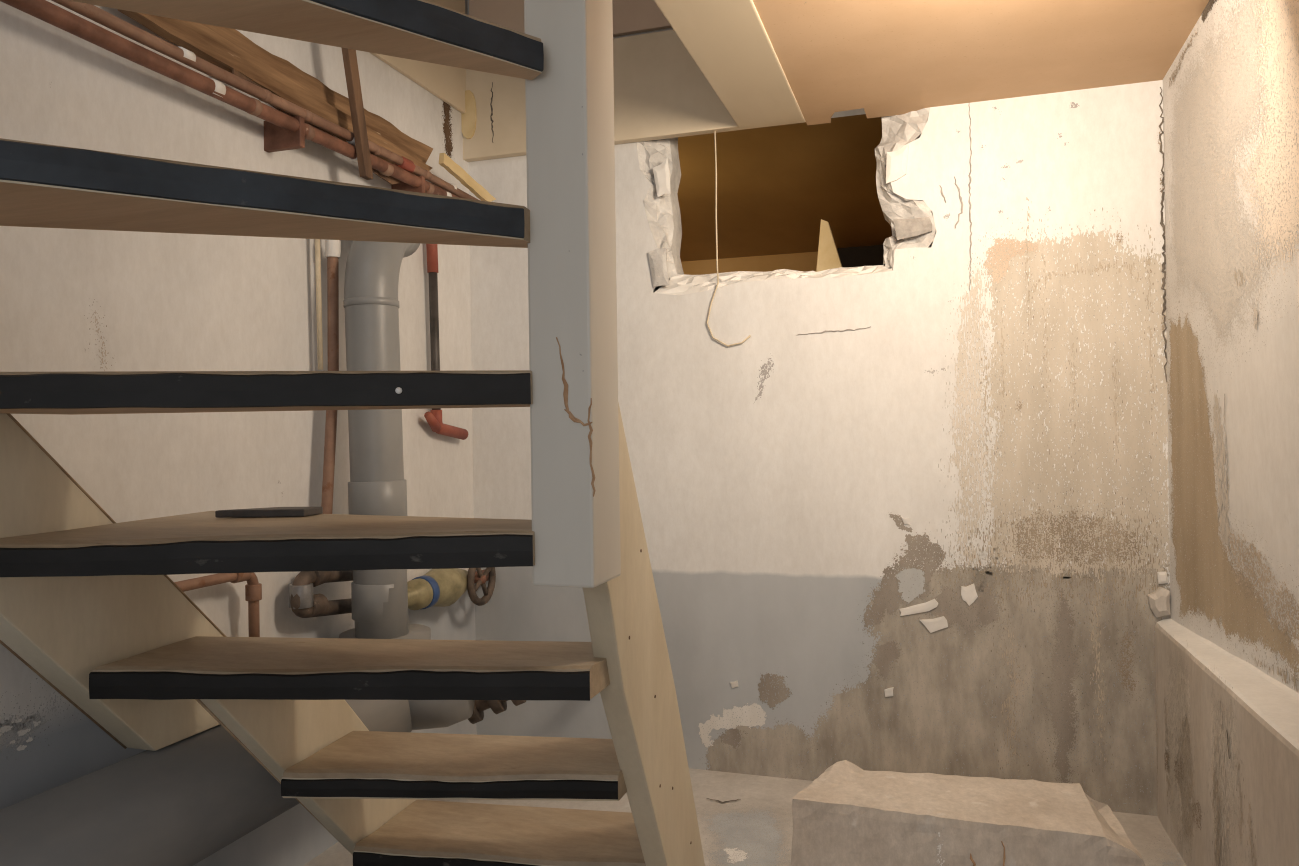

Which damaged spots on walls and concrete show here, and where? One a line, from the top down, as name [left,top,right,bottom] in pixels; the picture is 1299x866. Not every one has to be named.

flaking render [637,107,950,295]
water stain [937,0,1299,690]
peeling [698,514,1171,816]